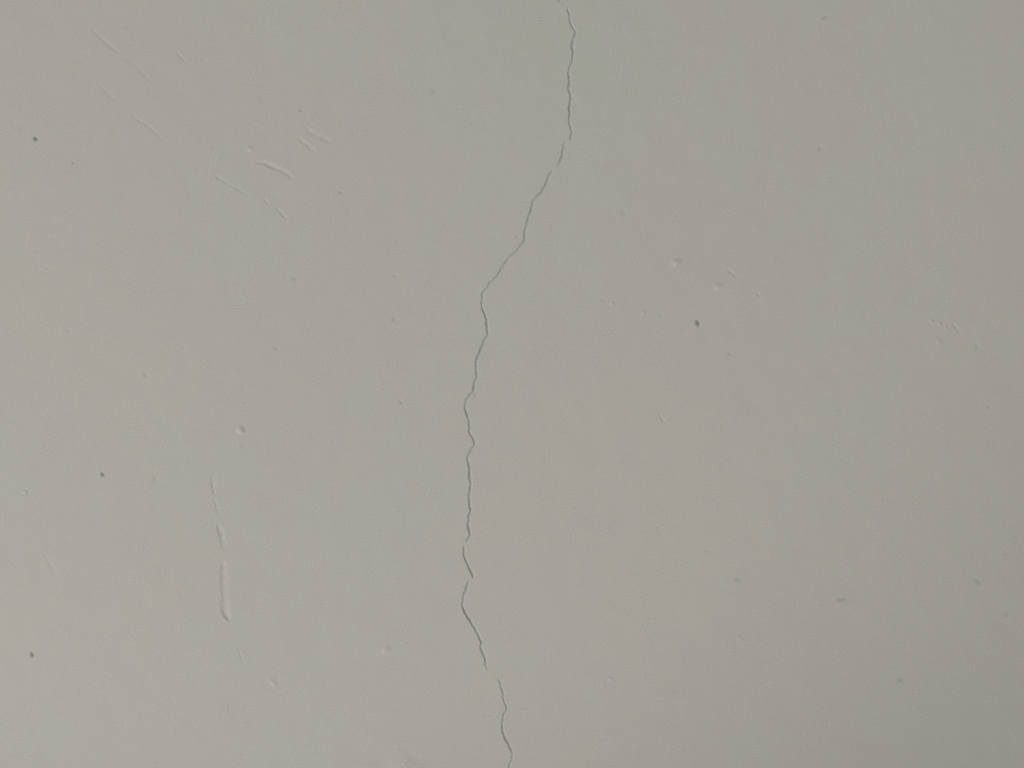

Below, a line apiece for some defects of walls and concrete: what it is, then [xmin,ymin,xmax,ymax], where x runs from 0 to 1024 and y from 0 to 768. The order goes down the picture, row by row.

crack [460,0,577,768]